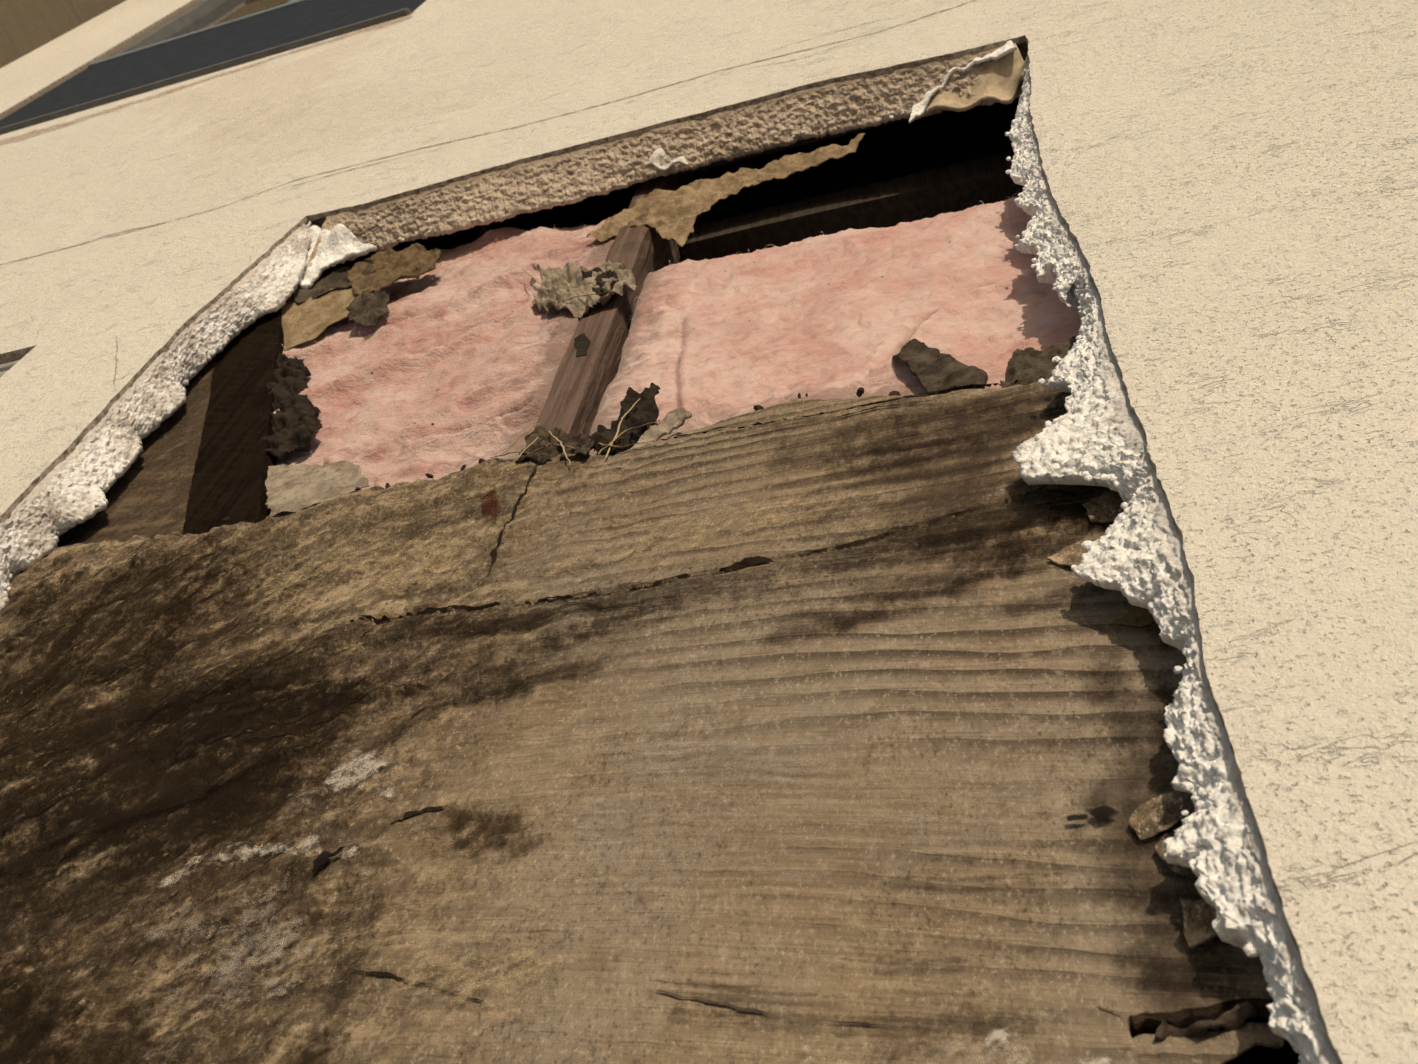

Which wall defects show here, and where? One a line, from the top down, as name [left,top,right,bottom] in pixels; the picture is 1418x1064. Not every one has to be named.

peeling [645,148,689,171]
spalling [0,221,378,613]
crack [325,458,981,632]
spalling [877,40,1339,1064]
leakage [312,846,345,873]